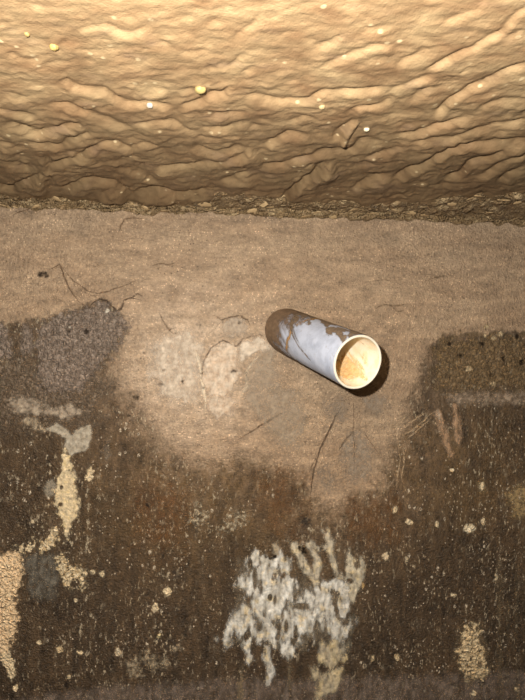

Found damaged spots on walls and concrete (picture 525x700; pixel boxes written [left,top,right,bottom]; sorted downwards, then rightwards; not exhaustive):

crack [51,265,140,311]
damp [9,398,92,540]
damp [447,392,525,405]
damp [48,529,525,700]